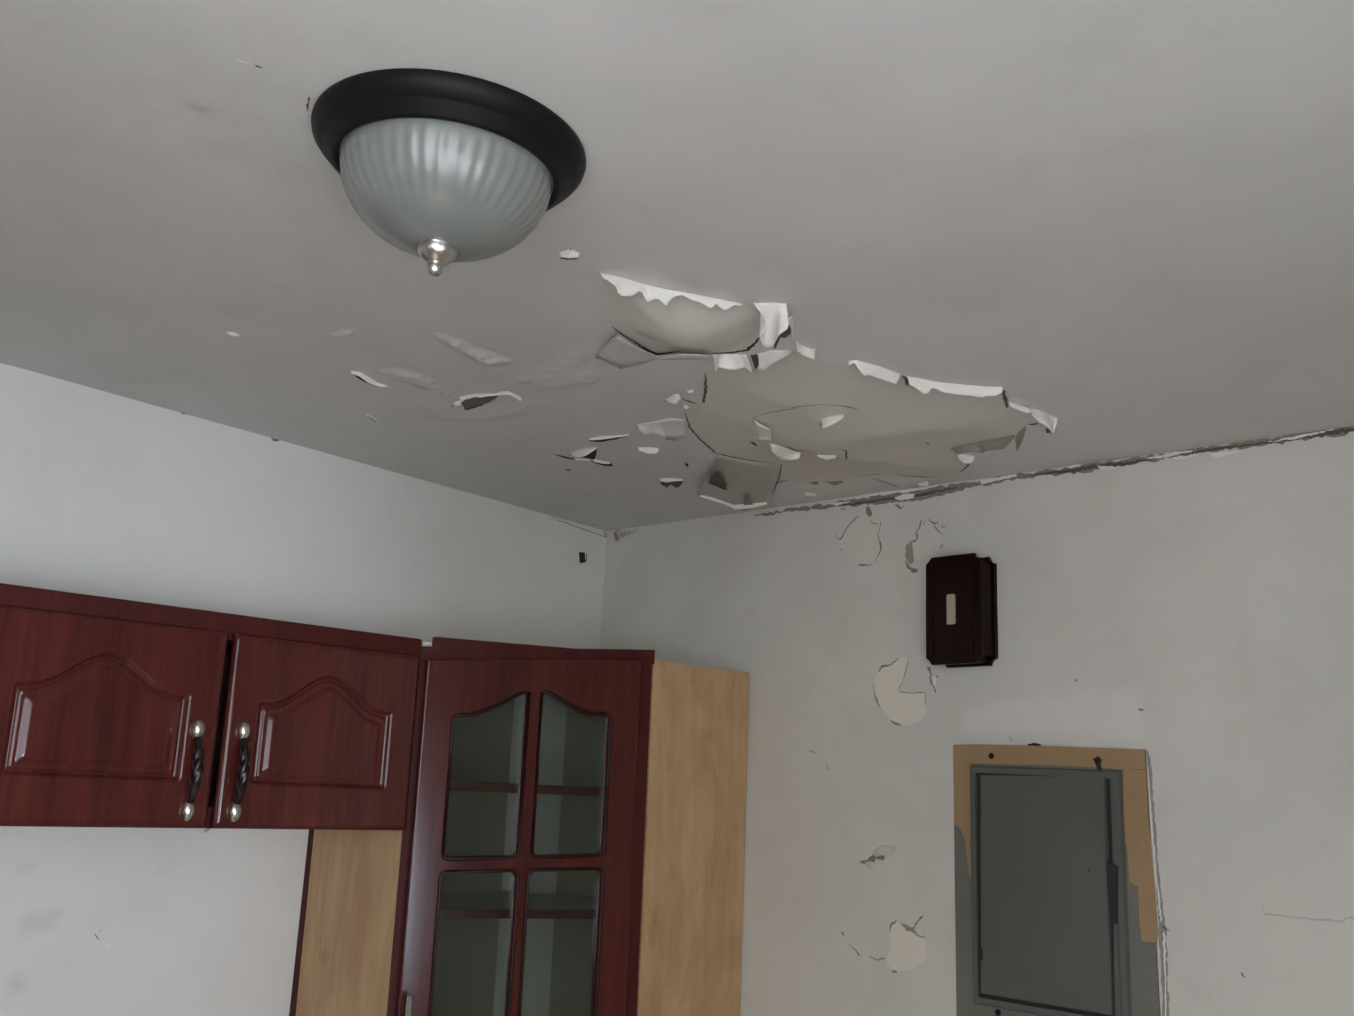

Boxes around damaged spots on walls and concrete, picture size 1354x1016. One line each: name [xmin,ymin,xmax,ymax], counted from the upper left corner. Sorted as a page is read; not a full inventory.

peeling [351,371,389,387]
peeling [451,391,521,410]
peeling [554,272,1058,497]
crack [755,426,1354,516]
peeling [873,657,939,726]
peeling [860,845,895,870]
peeling [841,915,927,973]